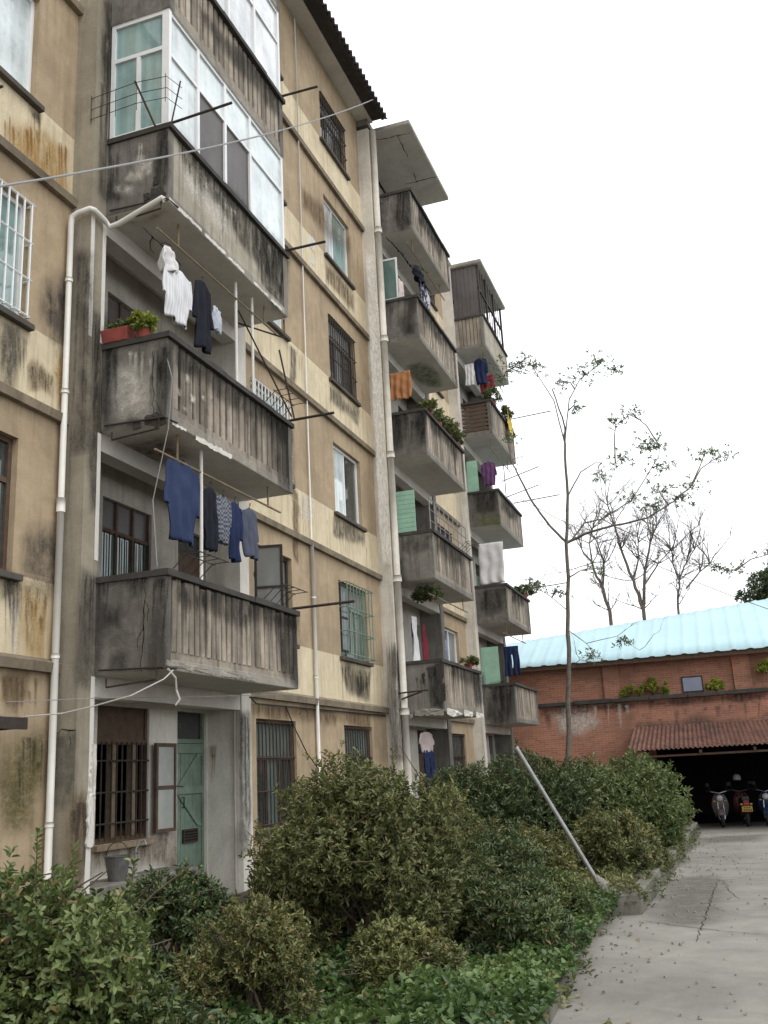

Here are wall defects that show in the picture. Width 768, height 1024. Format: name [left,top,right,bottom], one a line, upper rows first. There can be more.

water stain [103,2,112,84]
corrosion [12,130,67,186]
water stain [138,131,168,183]
crack [376,133,435,184]
water stain [182,144,288,308]
water stain [1,324,18,383]
water stain [29,366,49,389]
water stain [134,440,179,459]
water stain [159,345,313,558]
water stain [151,577,299,677]
water stain [344,664,369,698]
crack [650,878,768,941]